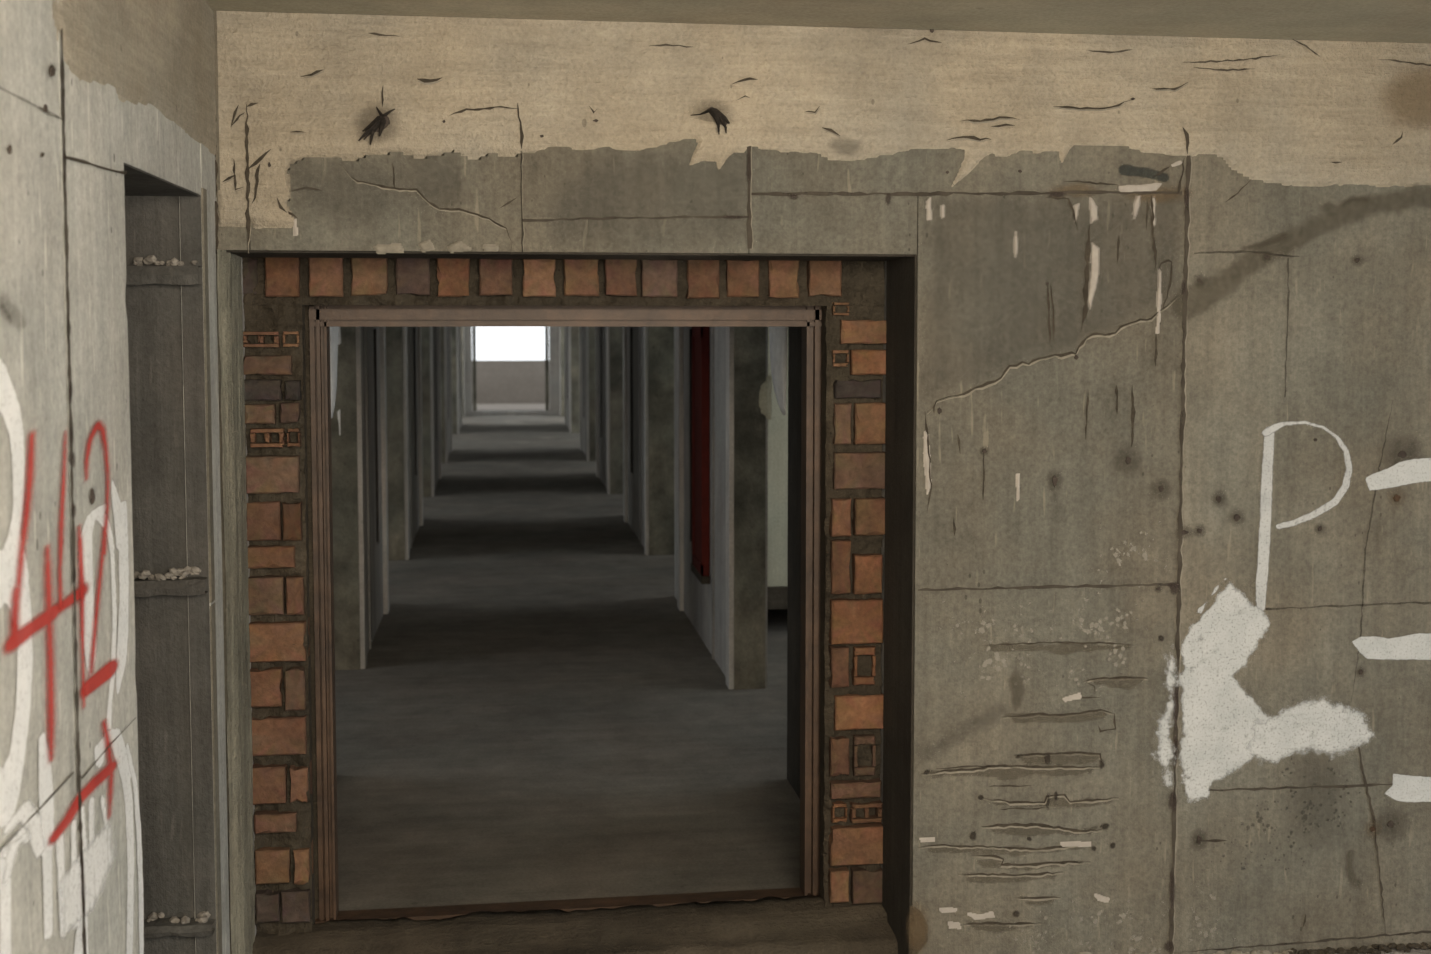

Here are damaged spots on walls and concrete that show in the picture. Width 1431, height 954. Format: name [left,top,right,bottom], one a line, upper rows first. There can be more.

crack [1054,39,1319,111]
crack [1379,58,1431,66]
flaking render [52,0,1431,349]
crack [948,116,1020,142]
crack [1182,128,1190,154]
peeling [330,327,341,435]
peeling [759,326,788,420]
crack [927,295,1179,414]
spalling [922,407,942,510]
spalling [1004,676,1148,732]
spalling [918,751,1119,878]
spalling [909,896,1061,954]